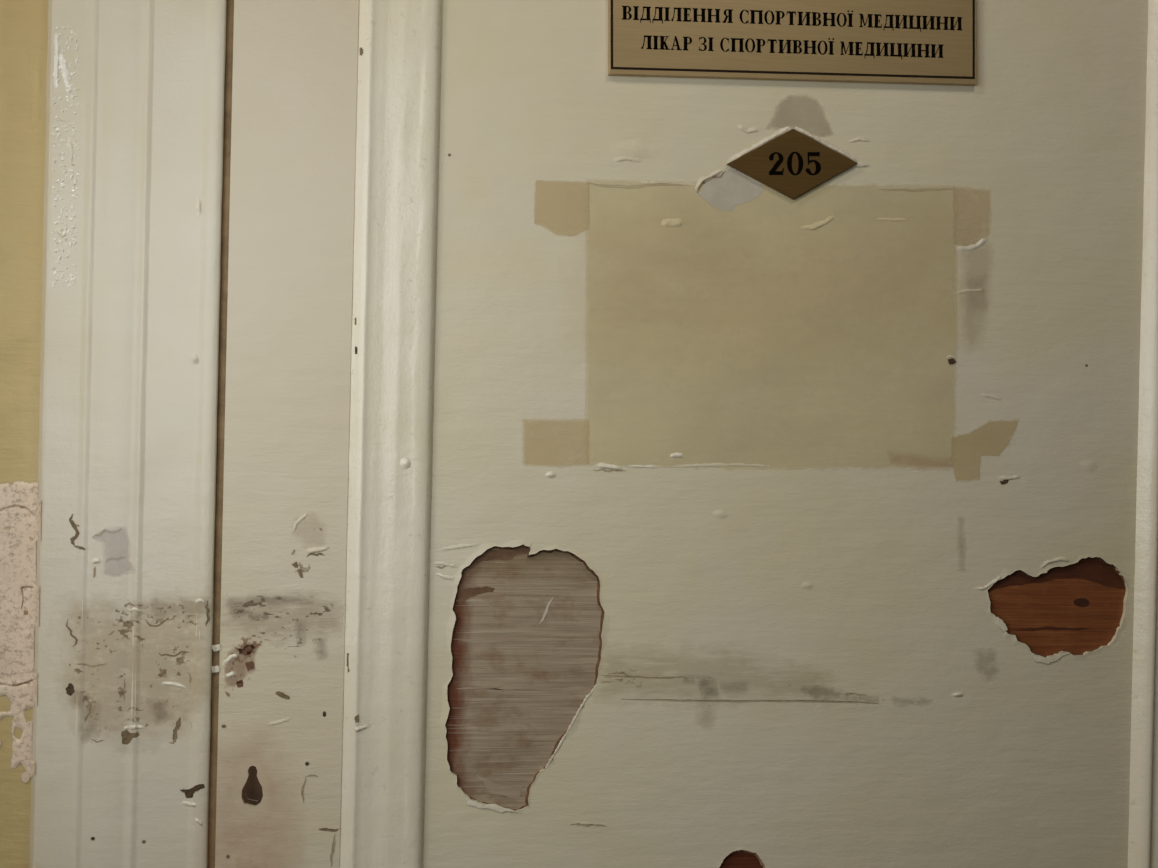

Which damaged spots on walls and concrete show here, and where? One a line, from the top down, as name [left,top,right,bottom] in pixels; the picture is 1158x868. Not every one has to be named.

peeling [695,97,873,211]
flaking render [0,481,41,783]
peeling [433,538,610,816]
peeling [972,554,1130,664]
peeling [716,845,769,868]